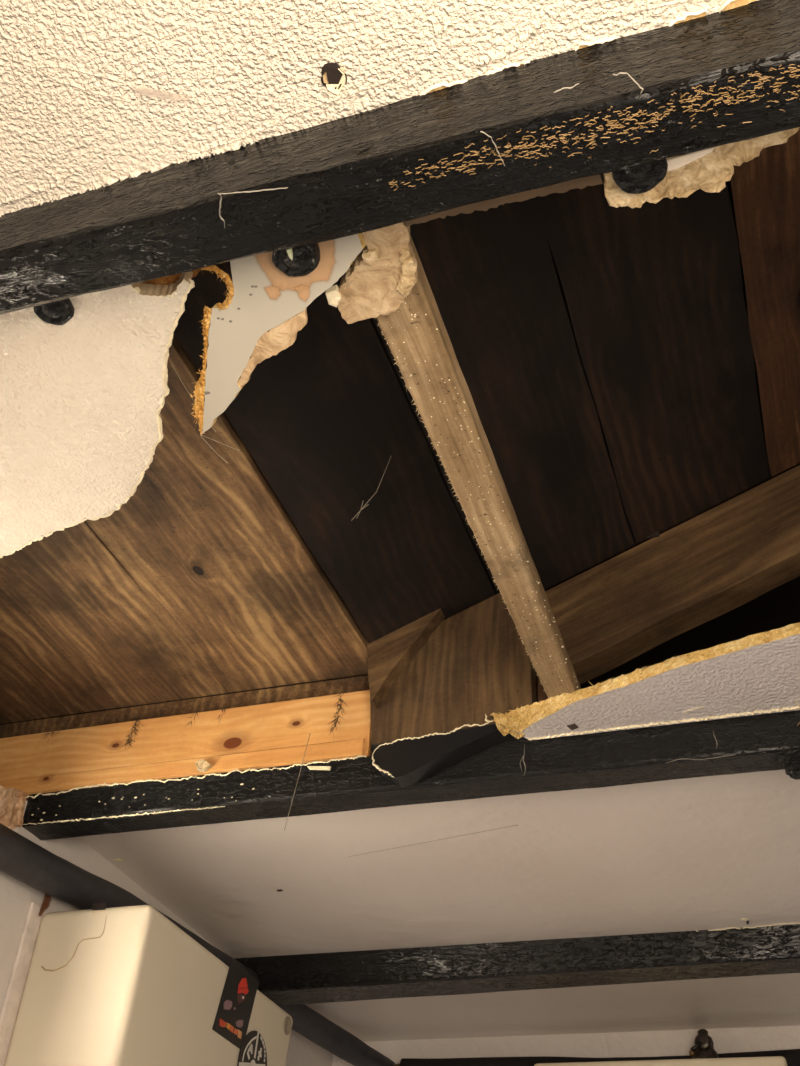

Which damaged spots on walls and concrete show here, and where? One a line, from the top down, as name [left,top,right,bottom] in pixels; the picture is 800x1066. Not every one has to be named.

peeling [667,147,714,171]
peeling [362,248,380,266]
peeling [396,248,417,295]
peeling [325,285,342,307]
flaking render [0,755,367,830]